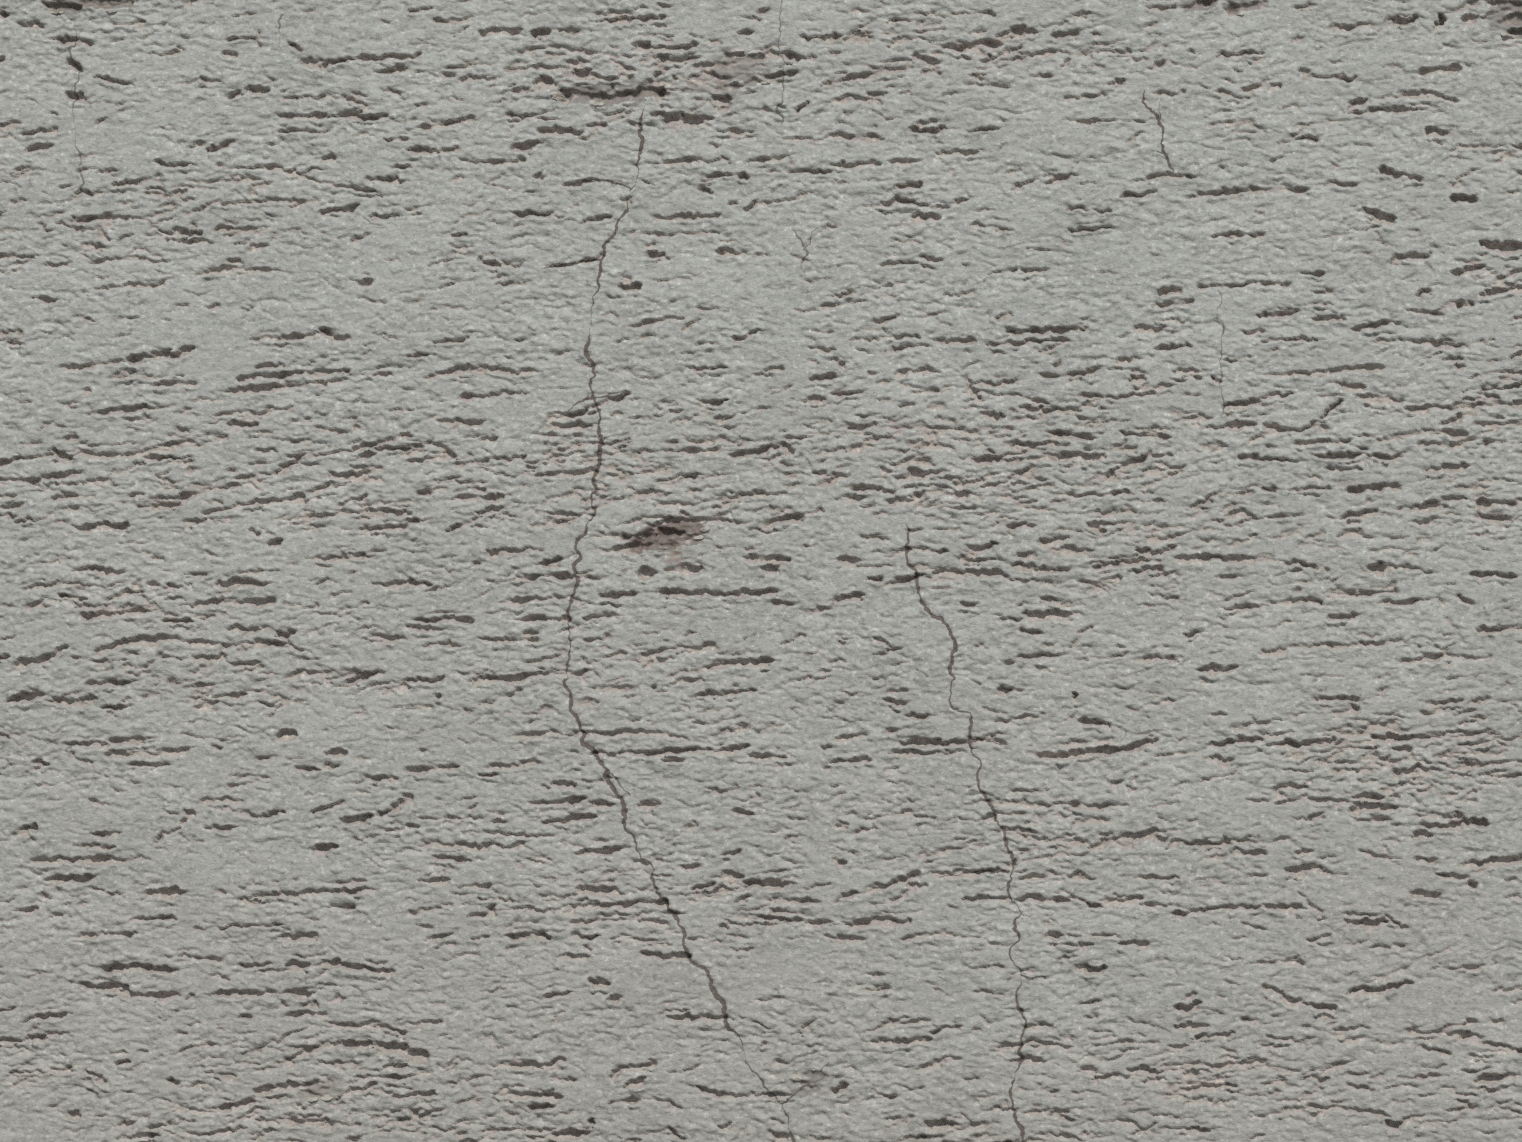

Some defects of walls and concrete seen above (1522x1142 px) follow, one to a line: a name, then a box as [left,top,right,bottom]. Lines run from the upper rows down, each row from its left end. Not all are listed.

crack [545,111,830,1142]
crack [905,524,1045,1142]